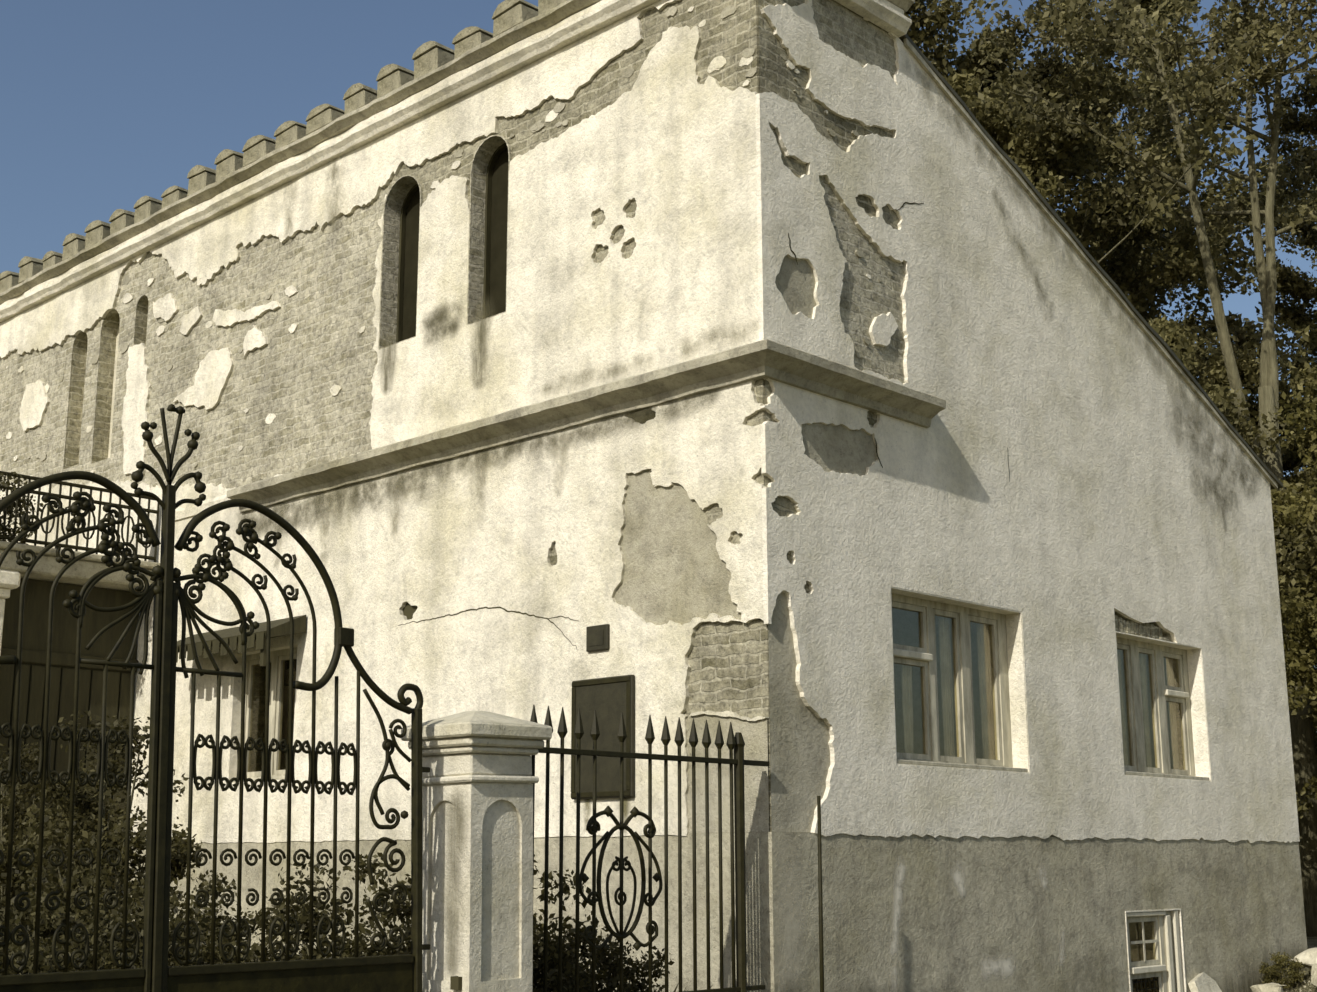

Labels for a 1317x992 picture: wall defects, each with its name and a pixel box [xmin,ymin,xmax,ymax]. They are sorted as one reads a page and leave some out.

spalling [0,0,905,489]
crack [398,607,578,649]
spalling [614,469,830,833]